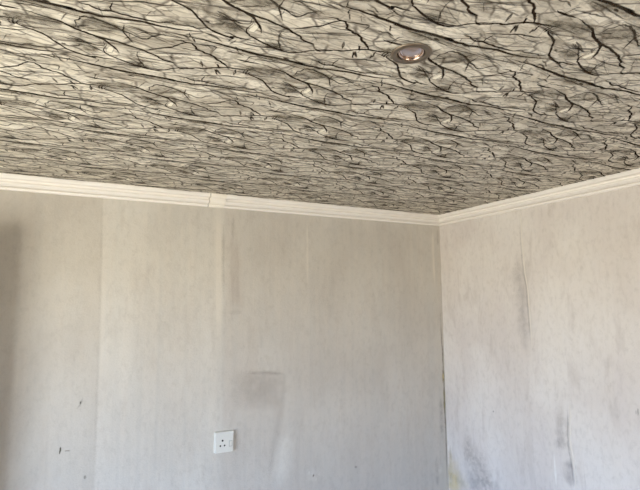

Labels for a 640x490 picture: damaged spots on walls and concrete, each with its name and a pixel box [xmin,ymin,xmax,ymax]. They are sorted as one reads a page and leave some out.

crack [209,193,227,208]